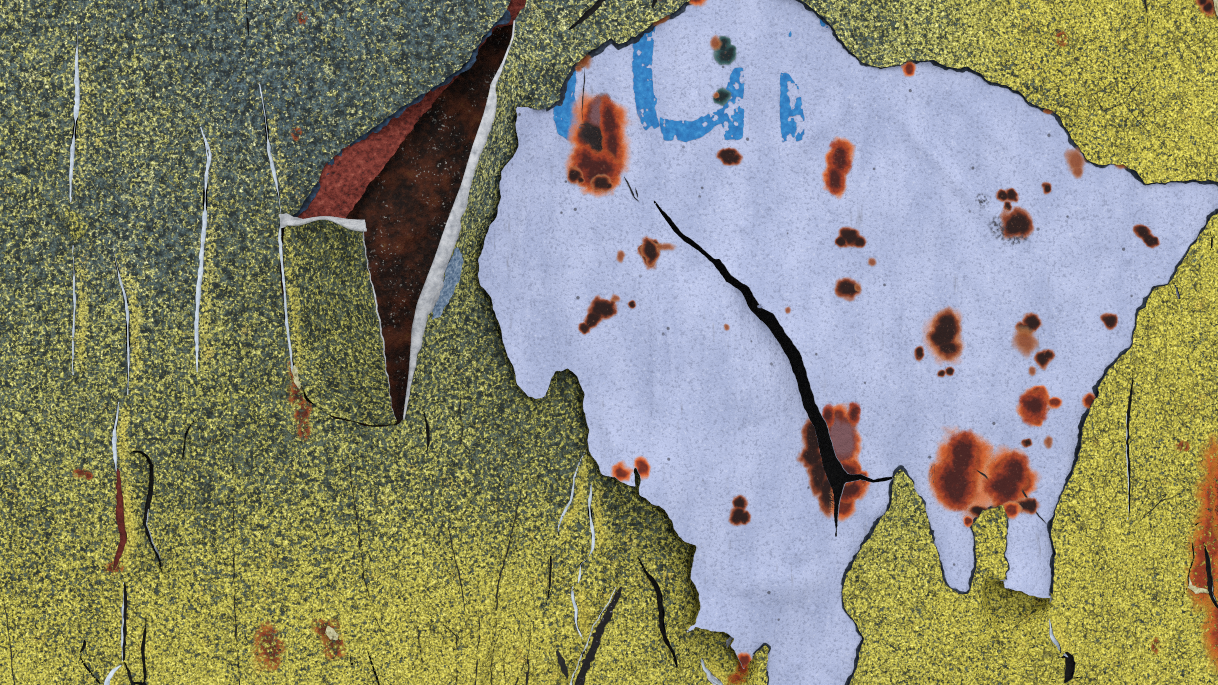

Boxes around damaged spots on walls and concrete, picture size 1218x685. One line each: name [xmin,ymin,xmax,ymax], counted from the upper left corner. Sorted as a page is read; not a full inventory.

peeling [279,213,302,228]
corrosion [567,95,627,195]
corrosion [823,138,854,197]
corrosion [990,188,1034,245]
peeling [292,365,301,389]
crack [624,177,892,537]
corrosion [798,402,870,520]
peeling [478,0,1218,685]
corrosion [914,308,962,377]
corrosion [929,313,1062,527]
crack [342,429,384,685]
crack [417,450,723,685]